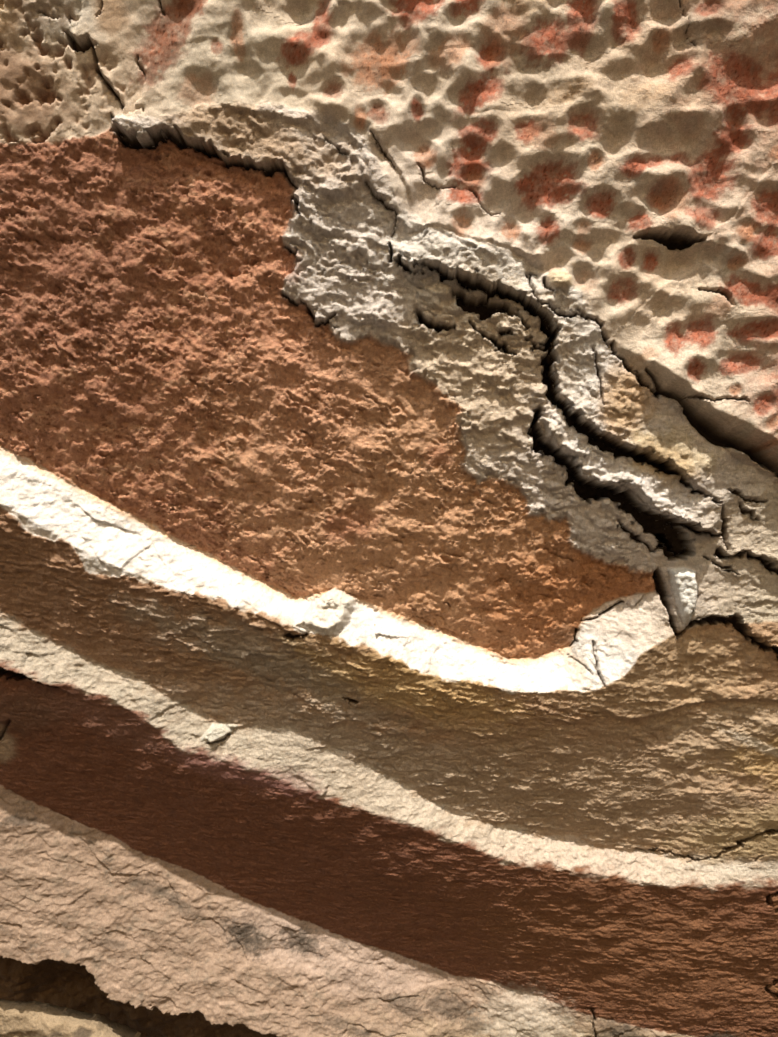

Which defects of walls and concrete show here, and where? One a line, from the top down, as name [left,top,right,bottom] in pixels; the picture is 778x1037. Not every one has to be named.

crack [36,0,301,215]
crack [324,137,348,157]
crack [369,128,501,216]
crack [282,244,302,262]
crack [279,289,337,327]
spalling [0,126,655,658]
crack [362,176,778,662]
rust [600,342,711,492]
crack [567,599,629,689]
crack [634,829,778,864]
crack [583,1008,597,1037]
crack [764,979,778,999]